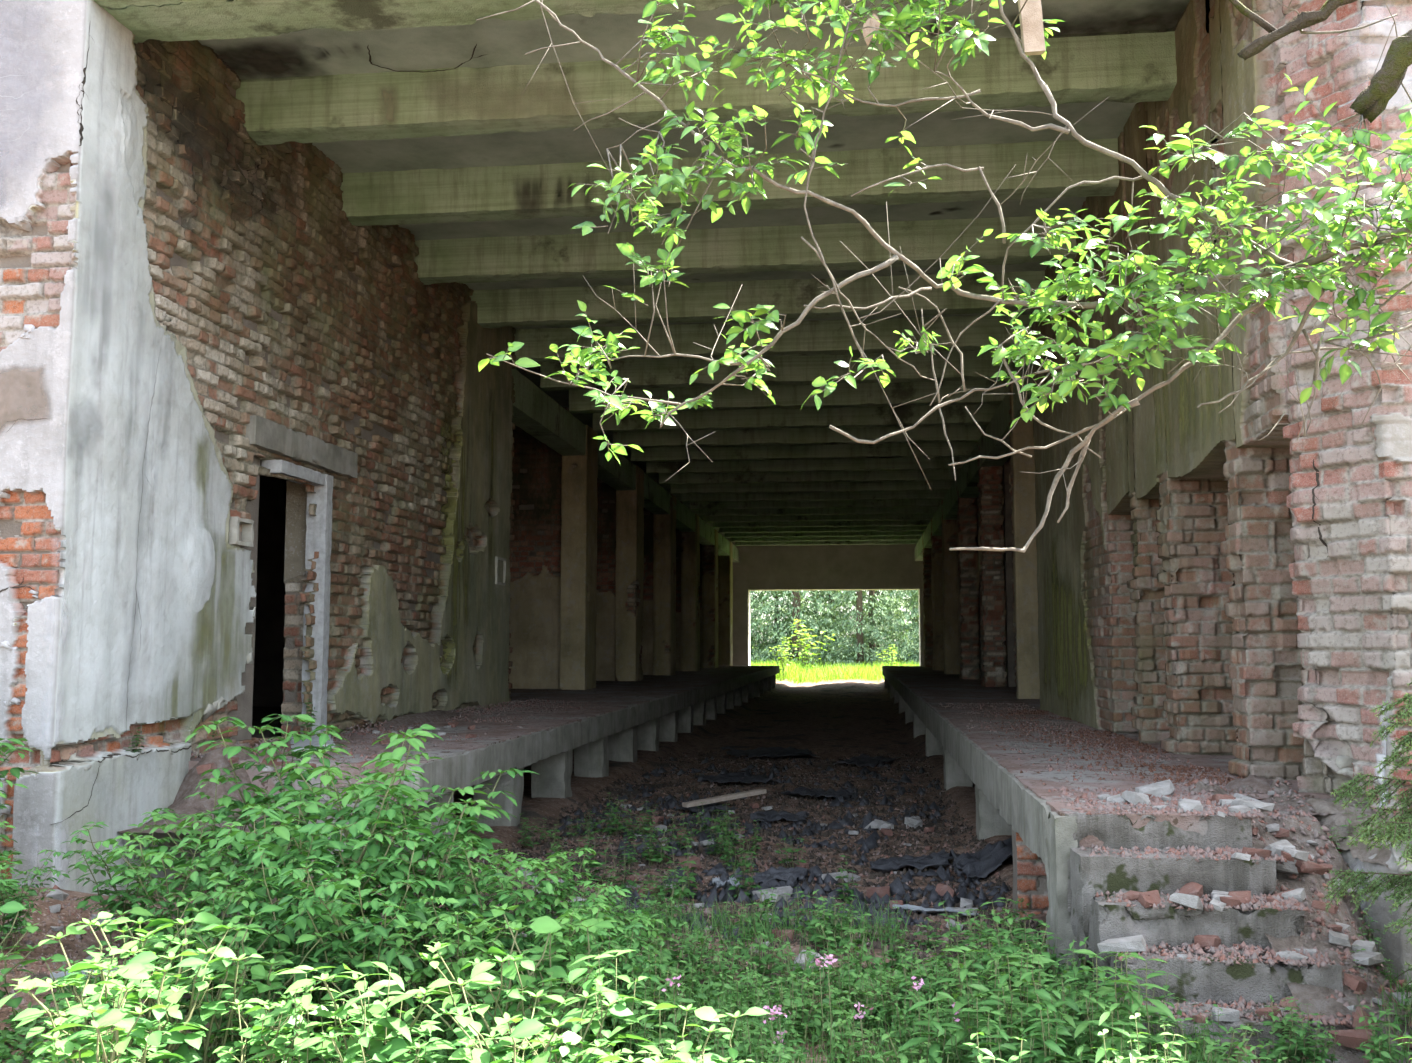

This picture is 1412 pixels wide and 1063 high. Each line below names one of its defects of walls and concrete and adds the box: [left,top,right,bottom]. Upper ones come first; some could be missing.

water stain [0,367,48,431]
spalling [0,150,79,352]
crack [50,350,192,825]
spalling [0,488,285,887]
spalling [133,39,516,735]
crack [367,44,487,72]
spalling [1256,0,1412,821]